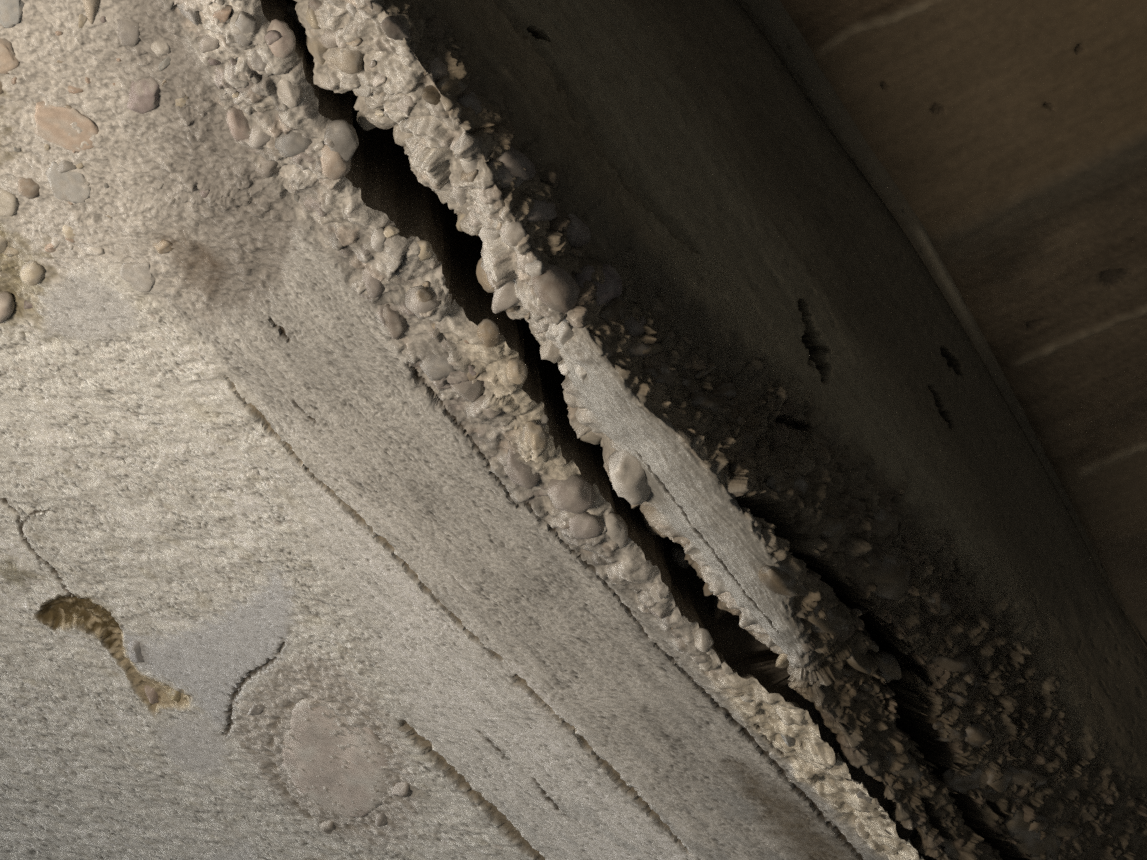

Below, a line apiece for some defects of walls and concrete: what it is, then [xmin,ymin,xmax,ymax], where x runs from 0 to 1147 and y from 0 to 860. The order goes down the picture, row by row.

spalling [0,0,305,328]
spalling [268,317,290,343]
crack [223,0,1044,860]
spalling [379,0,1147,860]
crack [0,498,75,597]
spalling [33,593,194,718]
spalling [231,653,546,860]